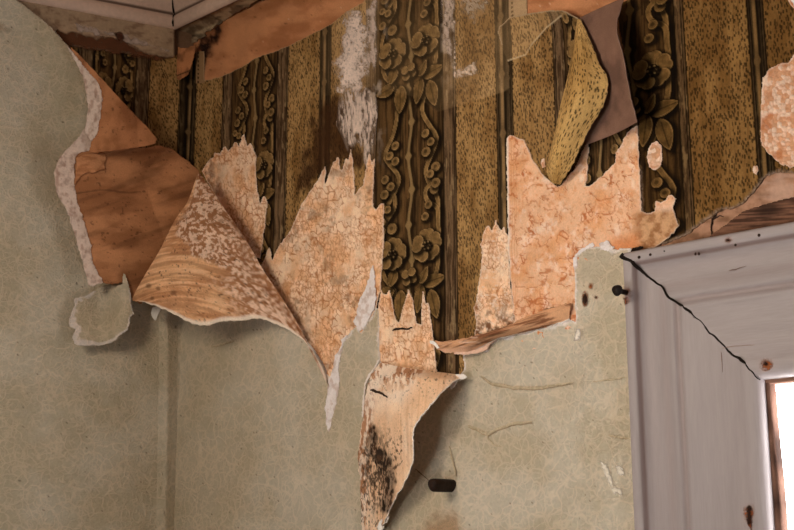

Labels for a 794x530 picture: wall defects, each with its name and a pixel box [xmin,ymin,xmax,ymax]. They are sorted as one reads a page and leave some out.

water stain [367,1,376,66]
crack [619,253,761,380]
crack [481,377,570,390]
crack [469,423,532,436]
mould [358,425,402,527]
corrosion [744,506,753,530]